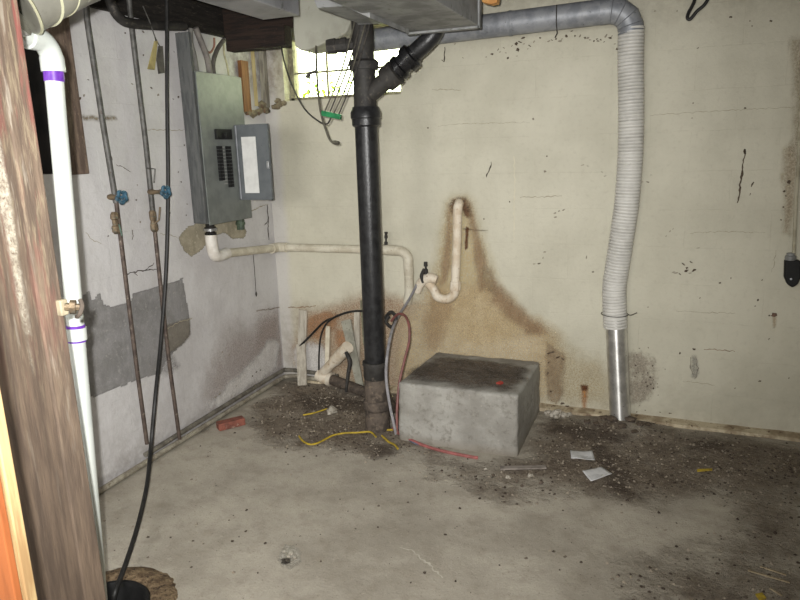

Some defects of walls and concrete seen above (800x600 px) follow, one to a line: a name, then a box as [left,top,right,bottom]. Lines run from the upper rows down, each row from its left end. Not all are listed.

flaking render [160,223,206,257]
flaking render [215,221,247,239]
leakage [384,199,556,397]
peeling [82,278,192,397]
leakage [294,301,364,379]